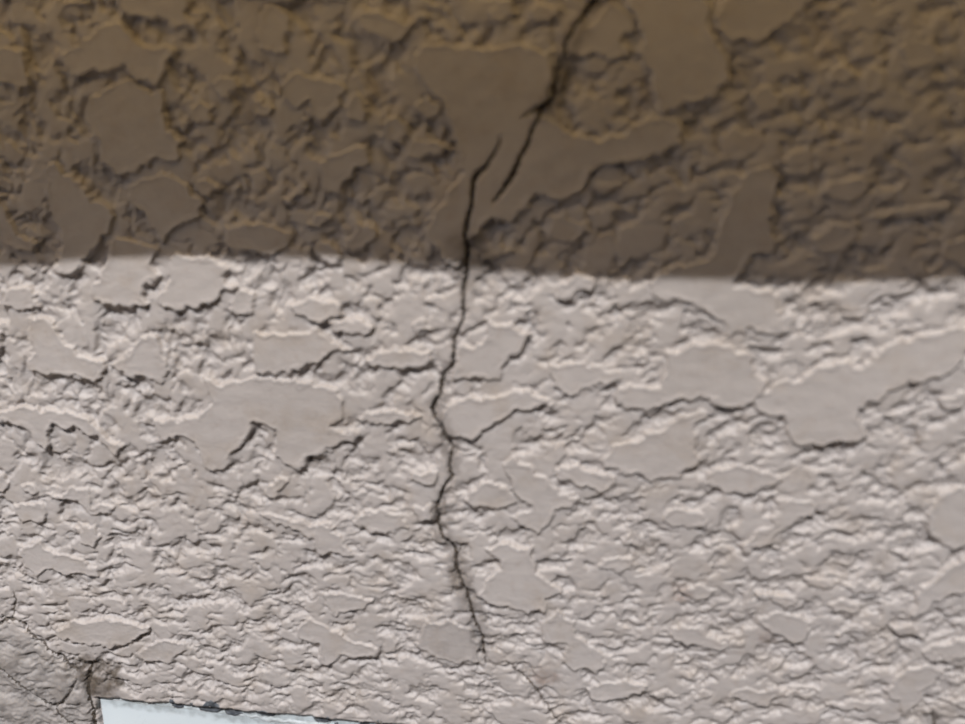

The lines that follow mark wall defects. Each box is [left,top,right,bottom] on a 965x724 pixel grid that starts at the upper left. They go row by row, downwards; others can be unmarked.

crack [431,0,599,722]